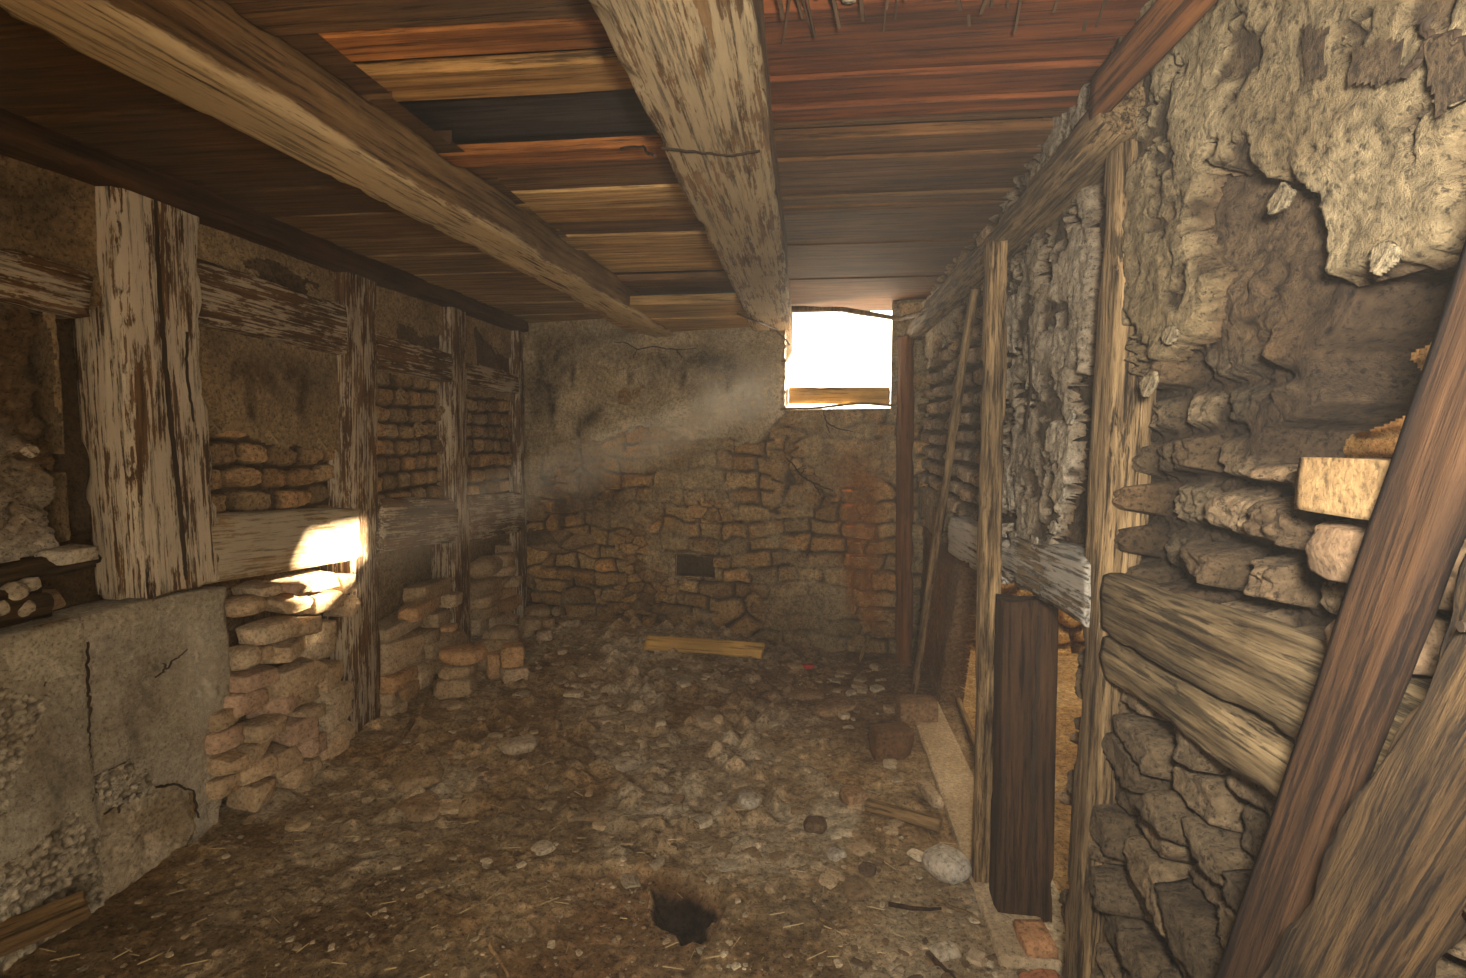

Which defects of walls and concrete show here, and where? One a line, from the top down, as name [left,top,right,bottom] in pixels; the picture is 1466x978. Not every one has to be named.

crack [85,642,200,818]